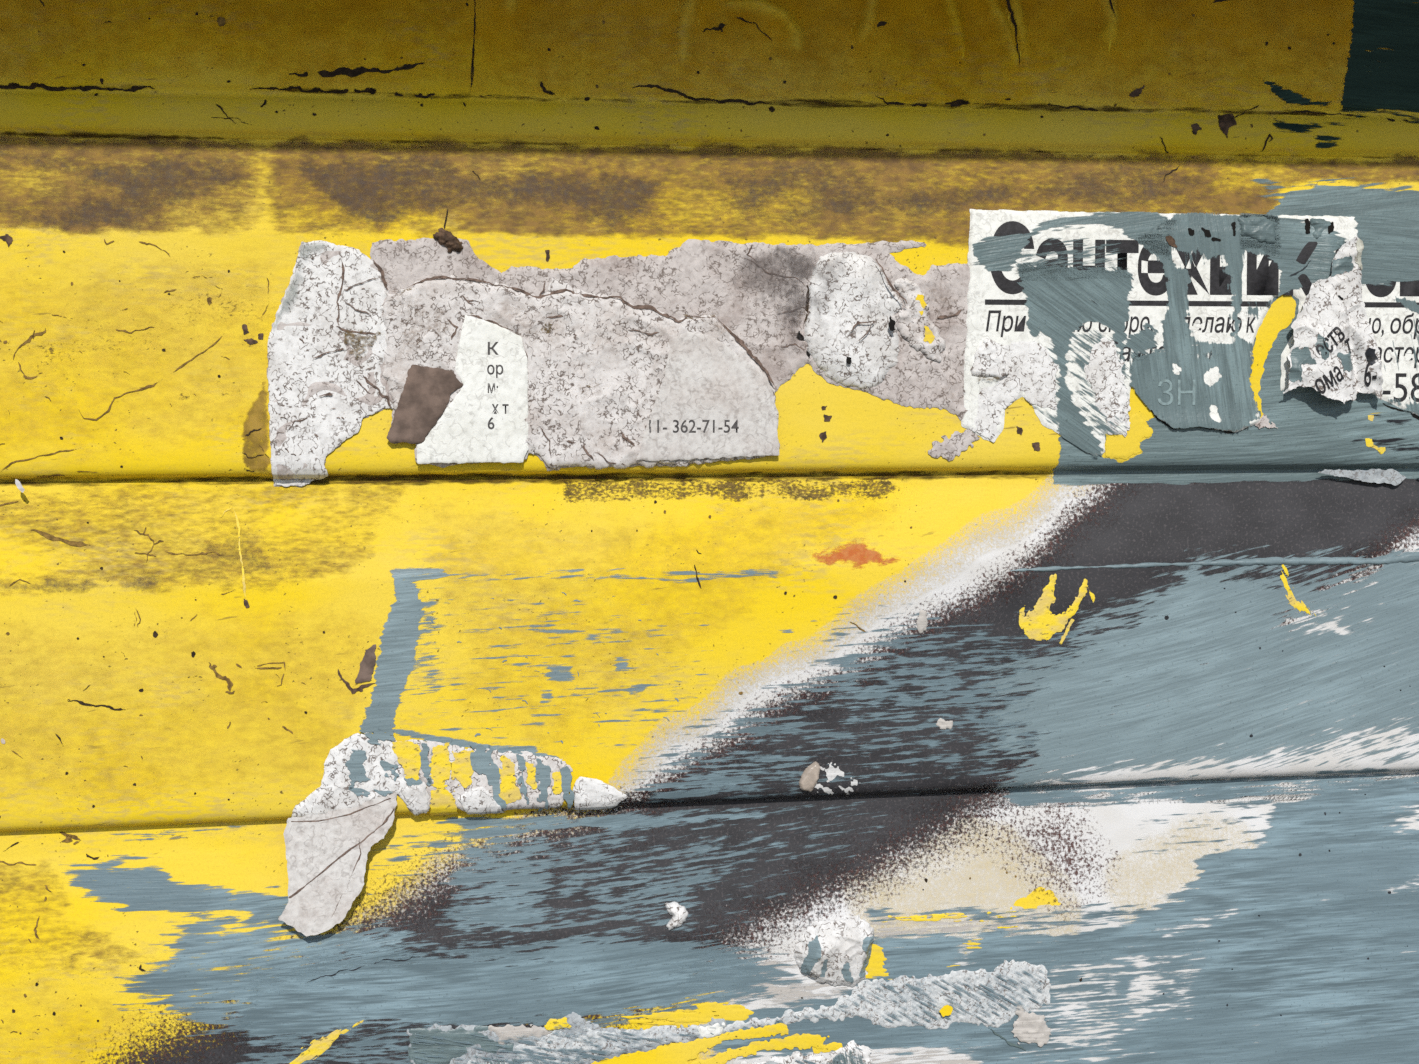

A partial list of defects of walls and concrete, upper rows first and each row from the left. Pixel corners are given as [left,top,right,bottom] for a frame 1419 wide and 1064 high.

peeling [1249,294,1296,424]
peeling [819,406,832,442]
peeling [1105,413,1153,459]
peeling [1365,438,1386,454]
peeling [665,901,688,930]
peeling [884,887,1061,928]
peeling [544,1017,572,1031]
peeling [592,944,1051,1064]